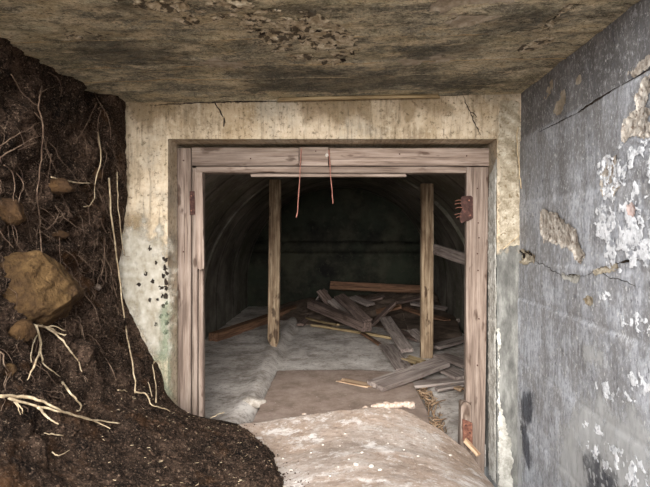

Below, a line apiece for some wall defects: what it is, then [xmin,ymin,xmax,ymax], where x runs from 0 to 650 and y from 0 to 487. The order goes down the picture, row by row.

spalling [130,0,361,66]
crack [154,101,276,127]
crack [540,68,650,132]
peeling [593,54,650,276]
leakage [119,216,173,356]
crack [536,260,633,285]